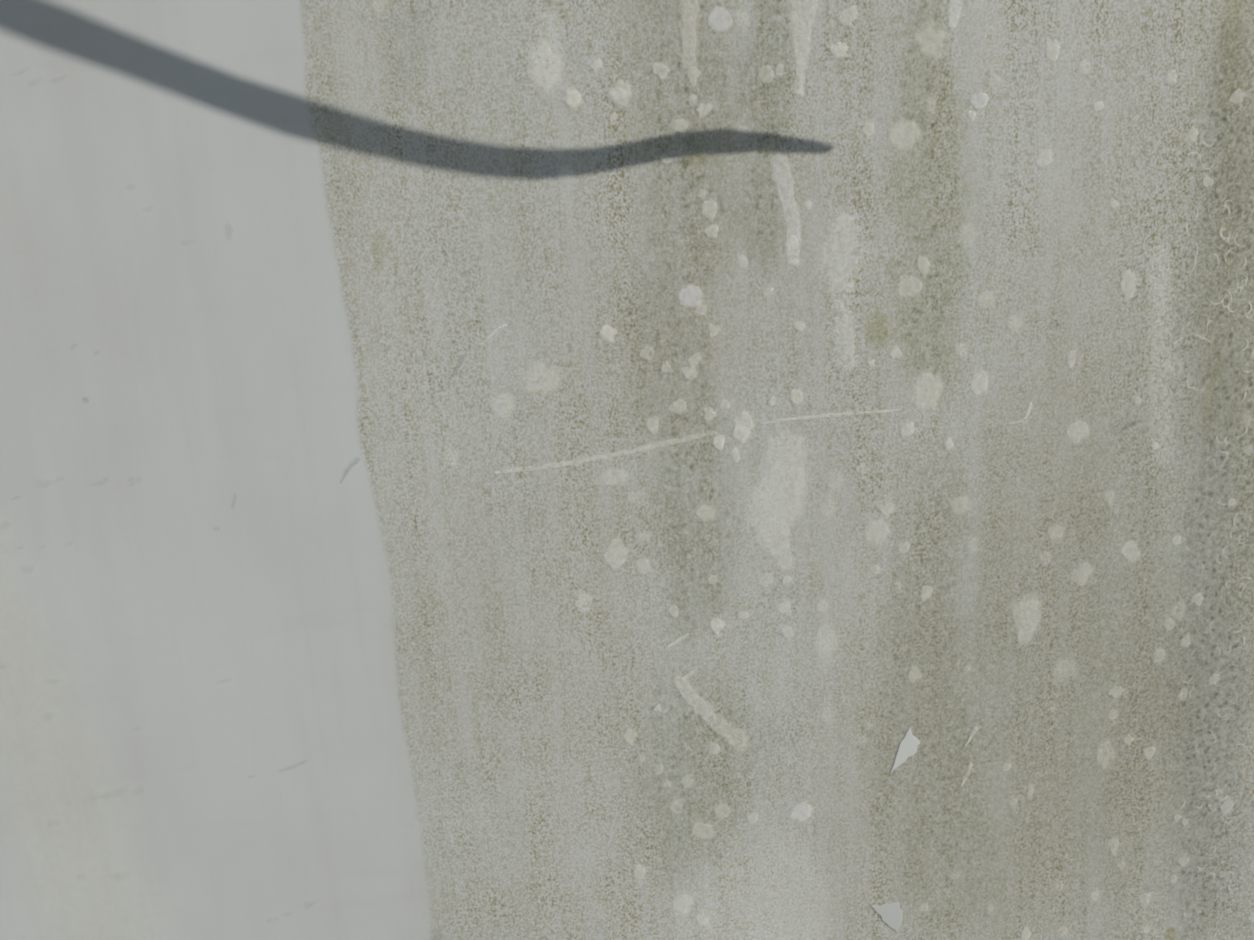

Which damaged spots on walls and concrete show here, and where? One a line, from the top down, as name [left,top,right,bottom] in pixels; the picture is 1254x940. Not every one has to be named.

damp [596,59,629,253]
damp [833,146,882,512]
damp [1125,4,1253,572]
damp [1106,587,1181,880]